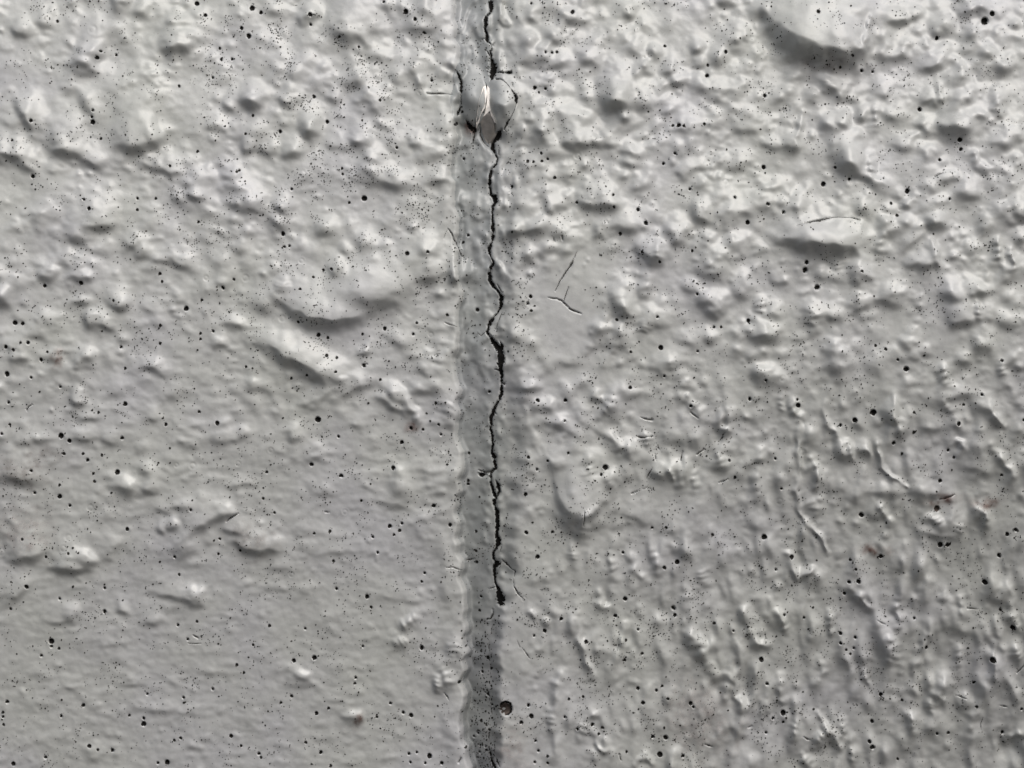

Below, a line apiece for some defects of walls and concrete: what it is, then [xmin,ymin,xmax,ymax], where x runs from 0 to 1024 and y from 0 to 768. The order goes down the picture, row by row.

crack [427,0,524,768]